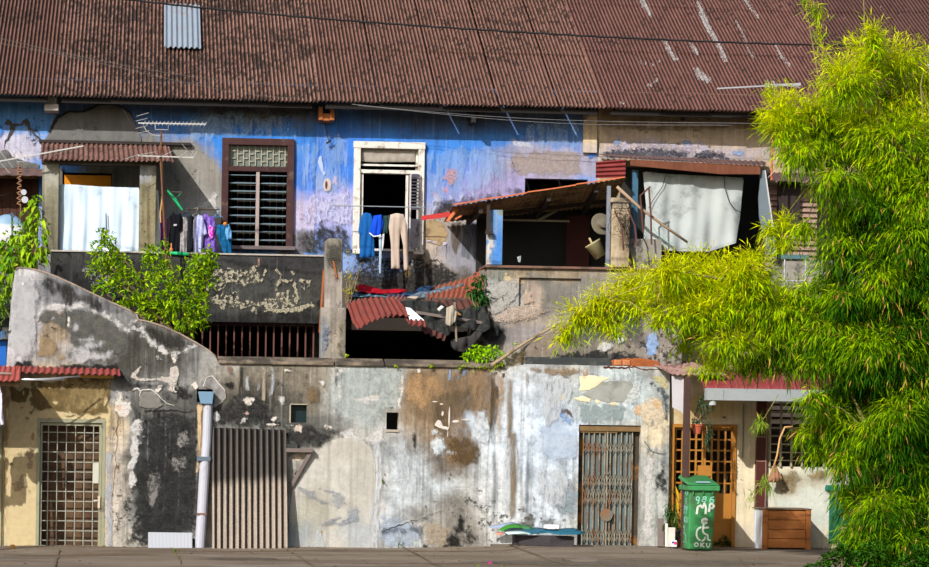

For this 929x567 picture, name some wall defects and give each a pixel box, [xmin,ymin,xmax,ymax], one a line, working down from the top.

crack [4,118,41,149]
peeling [609,138,743,156]
water stain [298,222,456,292]
water stain [451,222,476,259]
peeling [206,265,314,314]
peeling [114,392,132,417]
flaking render [131,366,179,393]
peeling [561,375,664,428]
spalling [611,358,668,389]
water stain [127,411,197,547]
water stain [213,367,473,548]
water stain [407,368,579,527]